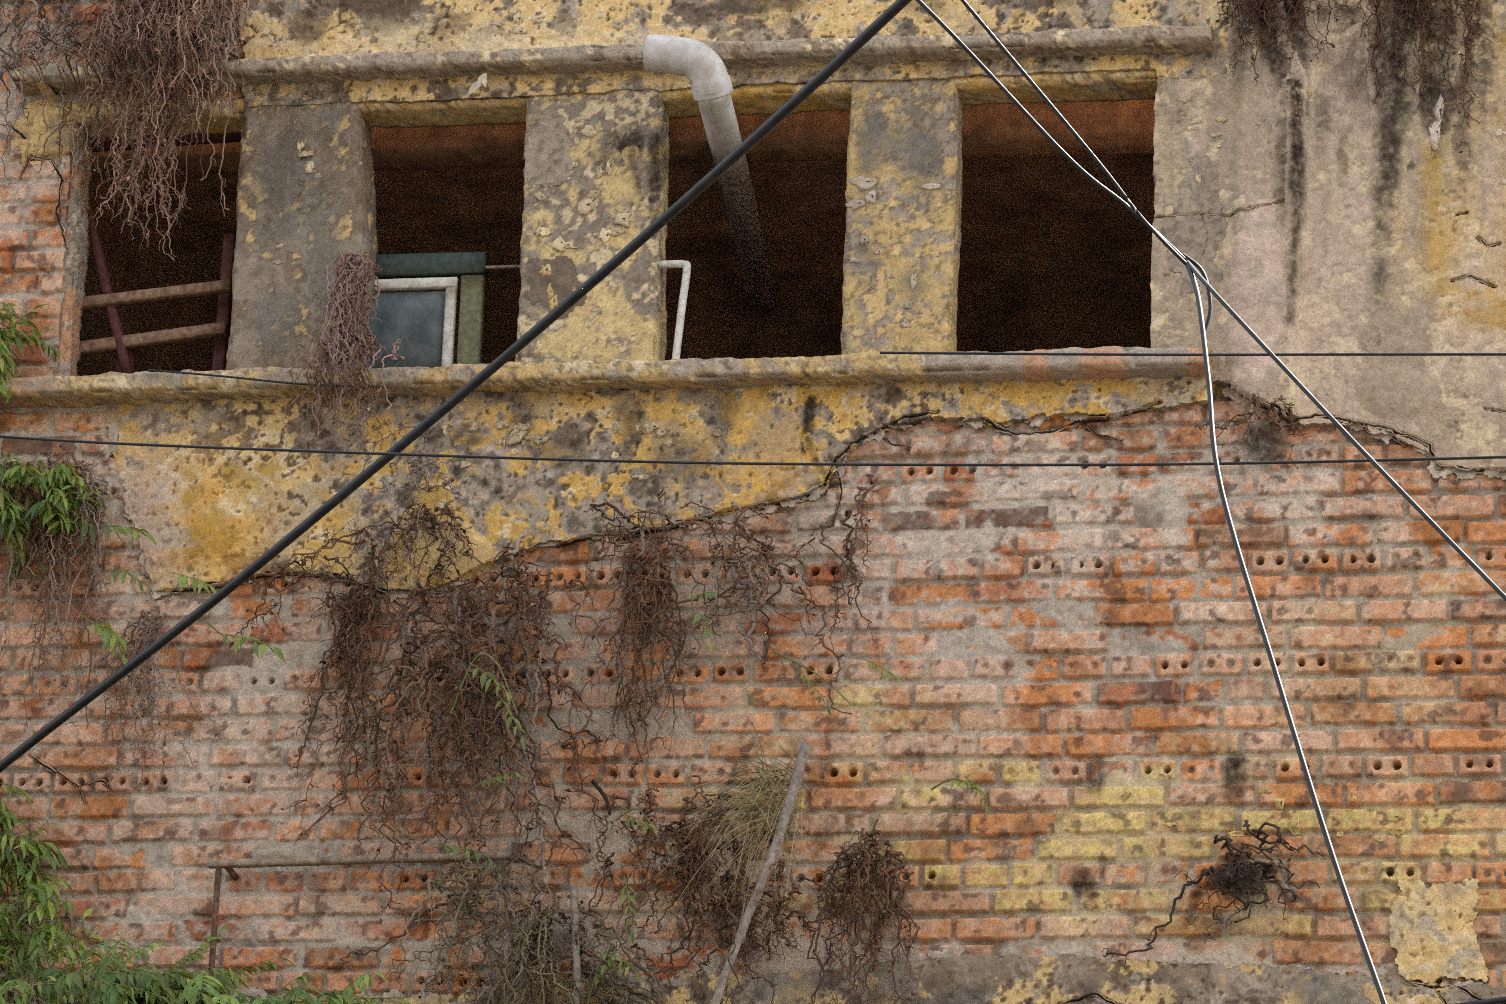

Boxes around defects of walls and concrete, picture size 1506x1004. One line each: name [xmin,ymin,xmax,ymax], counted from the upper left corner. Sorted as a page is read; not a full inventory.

water stain [1373,0,1456,200]
spalling [11,99,42,166]
peeling [297,141,322,179]
peeling [523,107,598,201]
peeling [578,157,615,214]
peeling [845,175,878,211]
water stain [1245,0,1355,317]
peeling [598,207,631,244]
spalling [525,225,587,319]
peeling [440,420,549,456]
peeling [603,421,676,459]
spalling [1309,984,1374,1004]